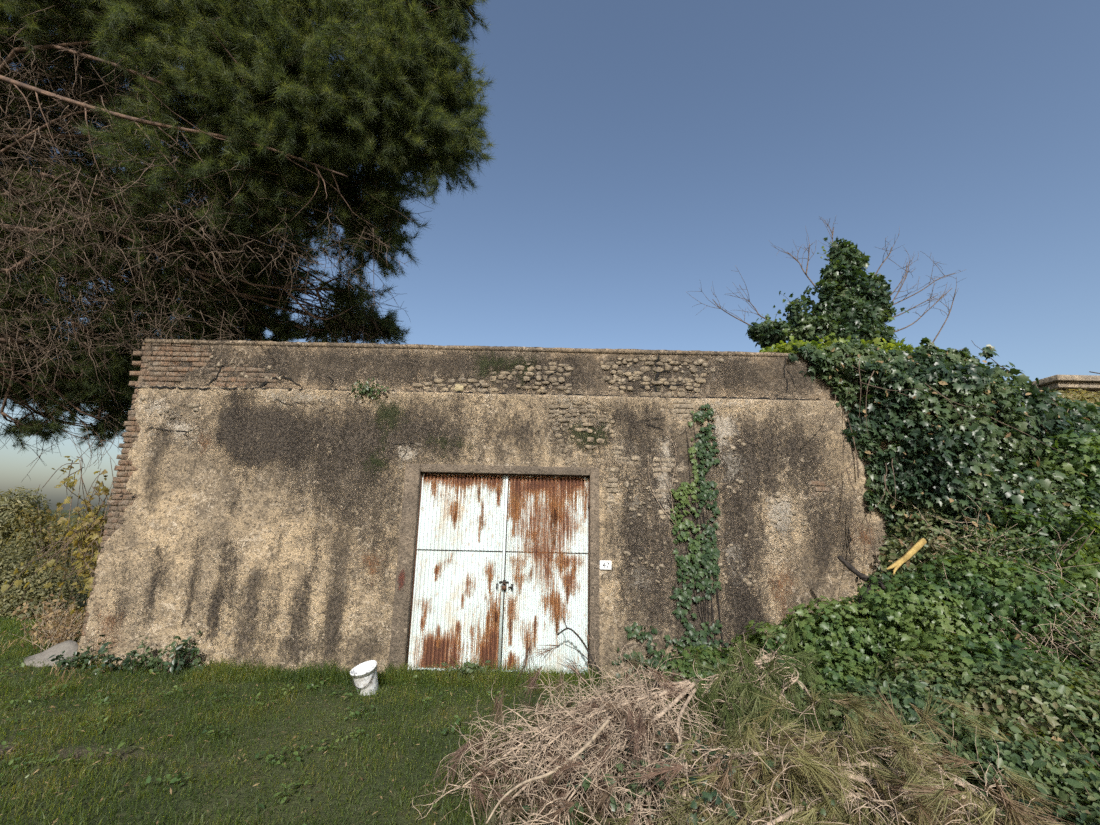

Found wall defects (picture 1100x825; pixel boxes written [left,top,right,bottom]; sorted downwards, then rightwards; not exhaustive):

corrosion [413,474,588,670]
damp [149,351,854,665]